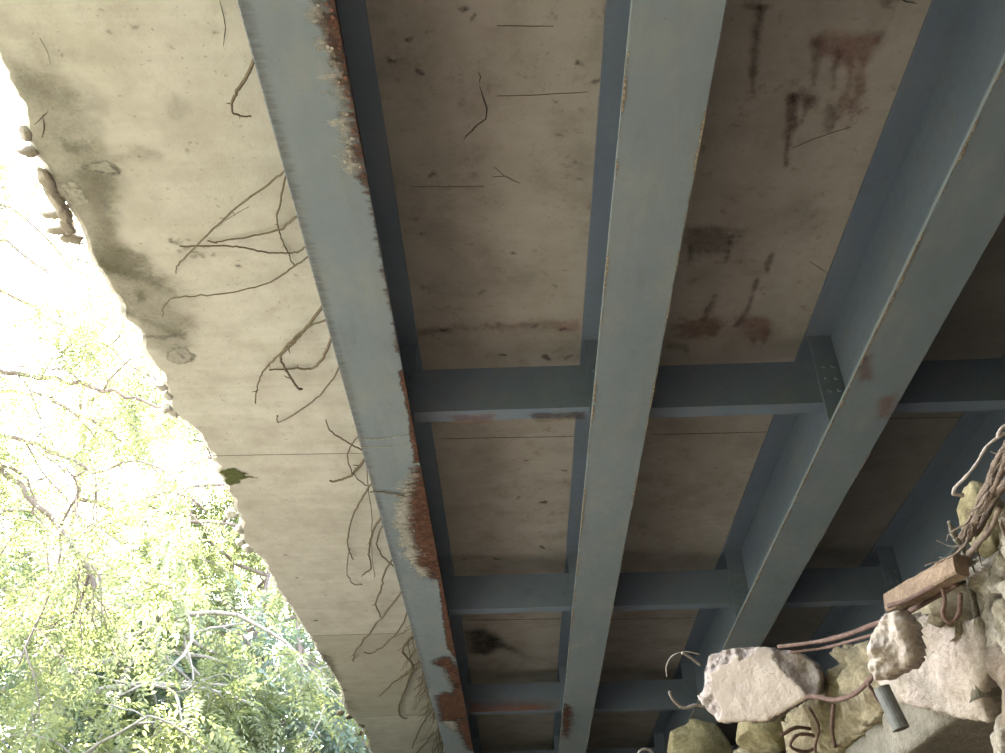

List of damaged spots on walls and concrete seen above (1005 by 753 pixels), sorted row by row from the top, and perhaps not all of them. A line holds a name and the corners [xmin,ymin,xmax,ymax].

spalling [12,124,89,245]
rust [315,0,391,306]
rust [398,369,473,751]